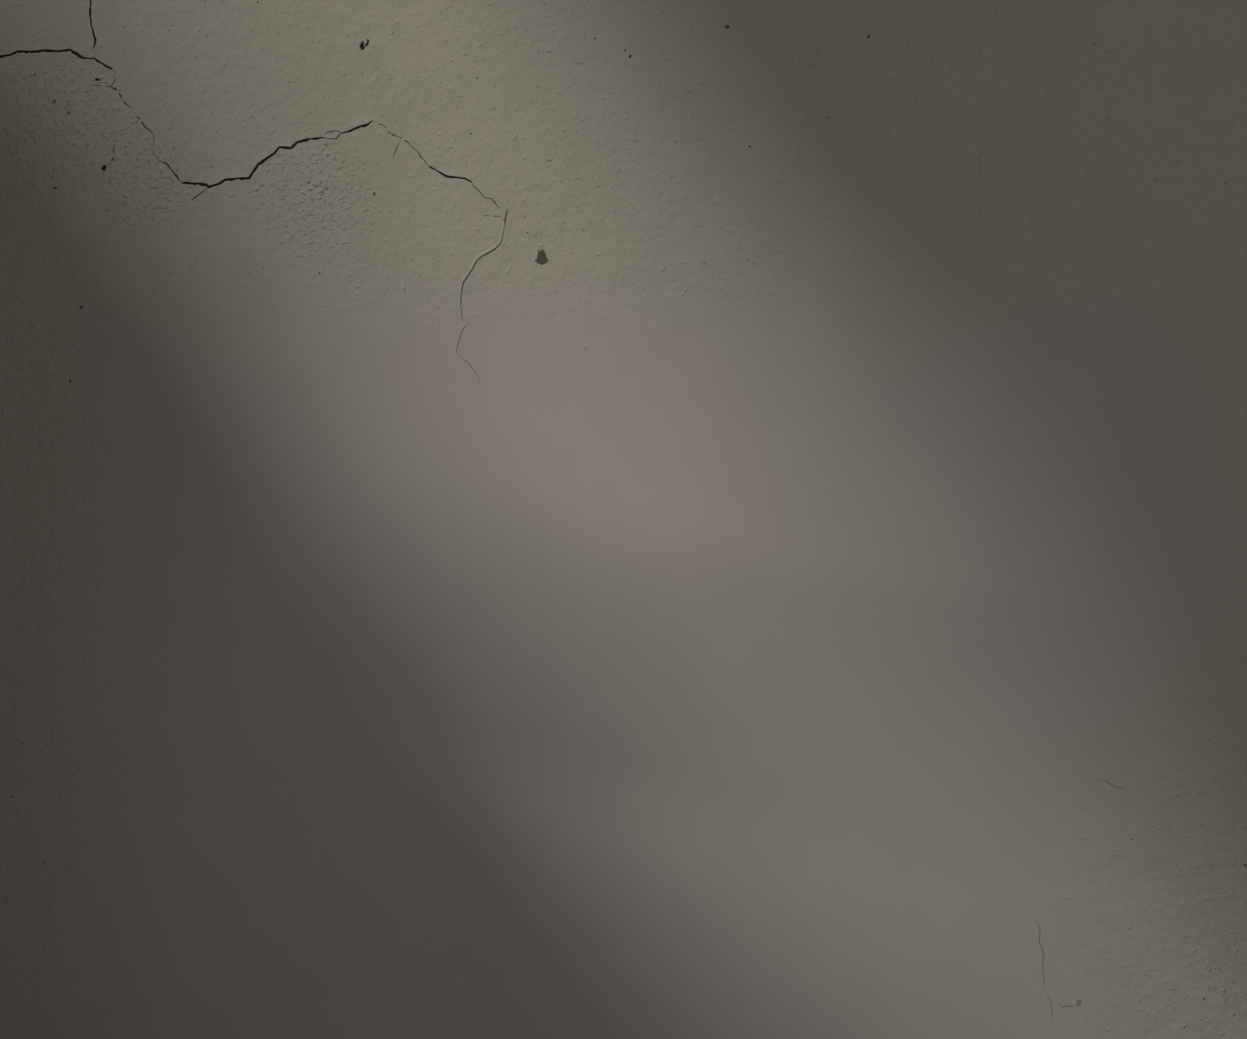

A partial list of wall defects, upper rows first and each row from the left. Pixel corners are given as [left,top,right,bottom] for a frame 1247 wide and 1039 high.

crack [0,0,508,385]